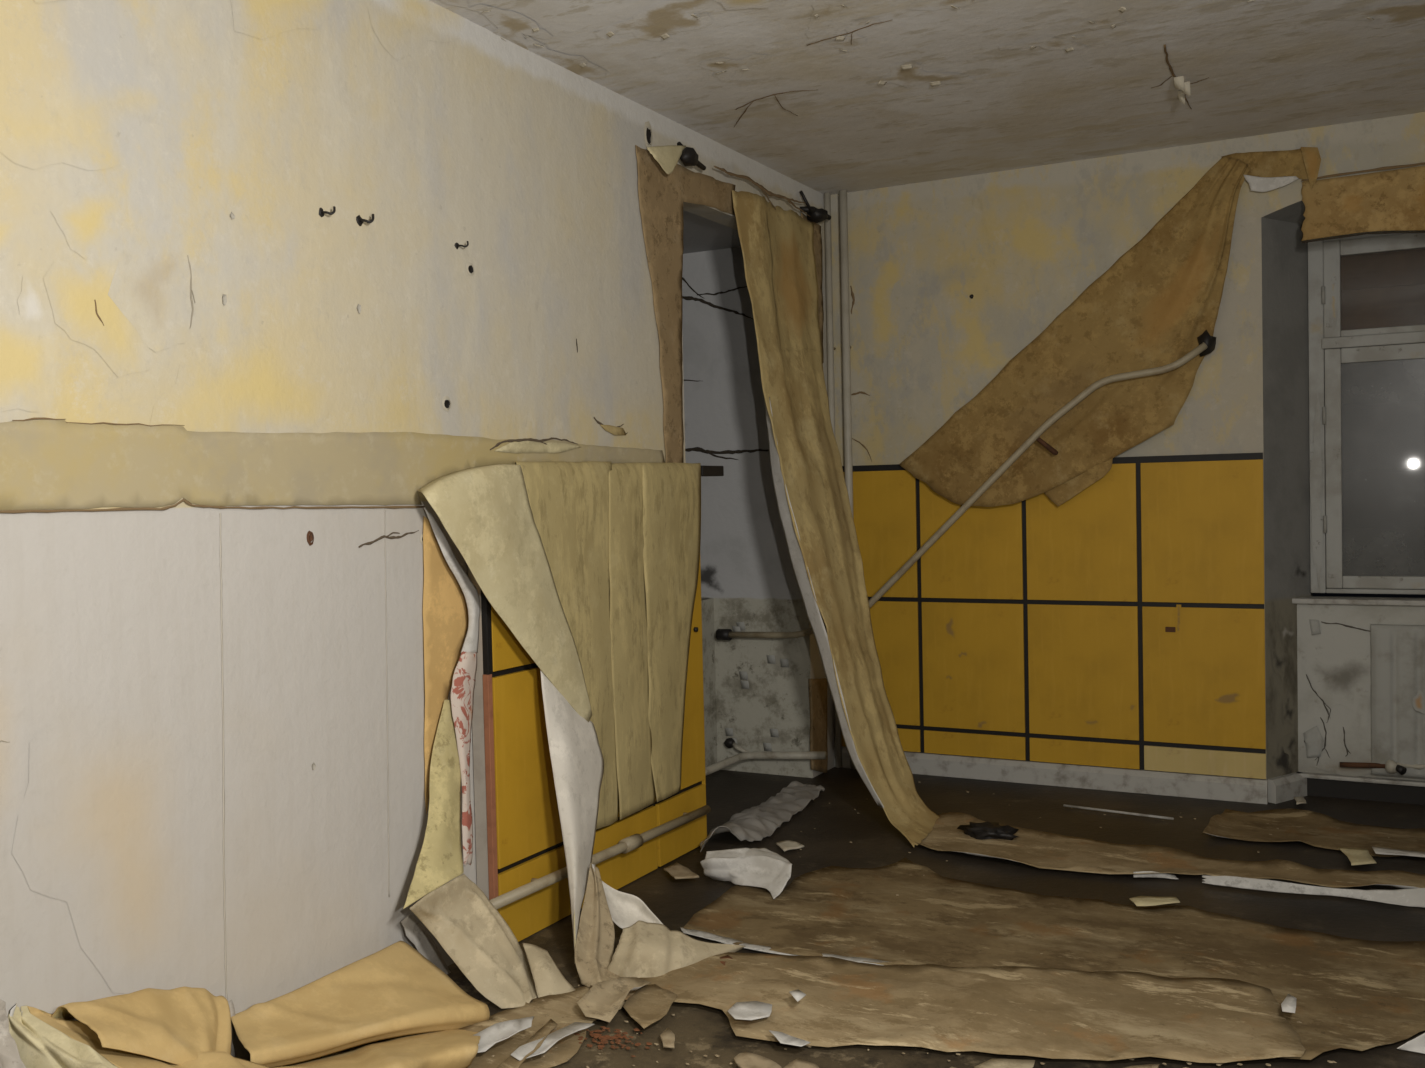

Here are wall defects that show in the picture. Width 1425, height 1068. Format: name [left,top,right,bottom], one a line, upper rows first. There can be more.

leakage [368,0,469,60]
crack [1152,44,1209,109]
crack [734,90,813,127]
spalling [714,609,761,648]
crack [1304,674,1351,766]
flaking render [776,840,804,852]